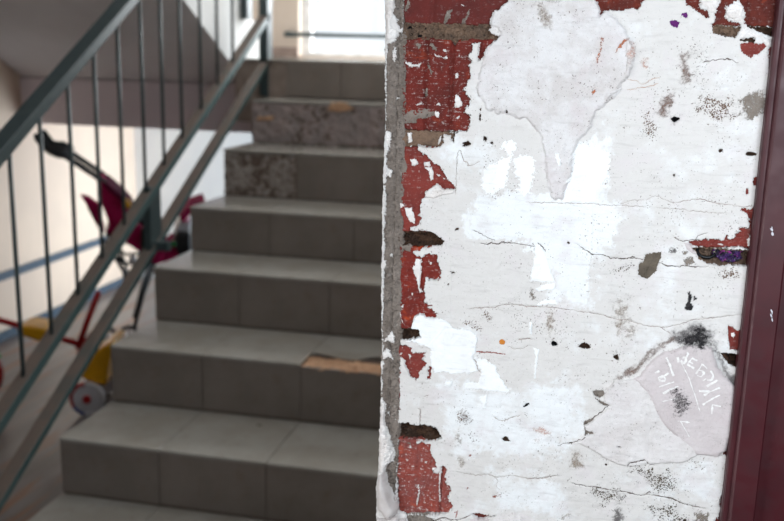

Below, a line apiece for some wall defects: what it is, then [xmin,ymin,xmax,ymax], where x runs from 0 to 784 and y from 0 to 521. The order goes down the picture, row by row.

flaking render [595,0,644,15]
flaking render [686,0,776,33]
flaking render [740,42,771,58]
peeling [480,137,536,197]
crack [529,196,751,213]
crack [474,230,546,251]
flaking render [689,208,753,248]
flaking render [302,0,509,521]
crack [580,246,707,268]
crack [470,304,733,334]
crack [557,390,609,446]
crack [574,483,702,508]